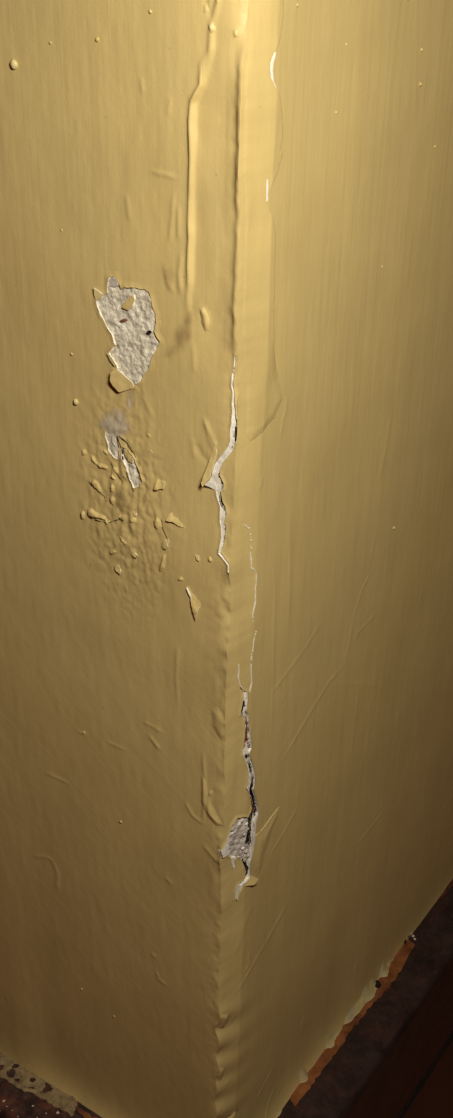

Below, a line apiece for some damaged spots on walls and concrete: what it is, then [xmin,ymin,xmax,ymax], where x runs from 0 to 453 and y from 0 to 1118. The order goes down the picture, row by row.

peeling [81,271,166,524]
peeling [153,512,185,572]
peeling [177,577,201,620]
crack [201,351,259,820]